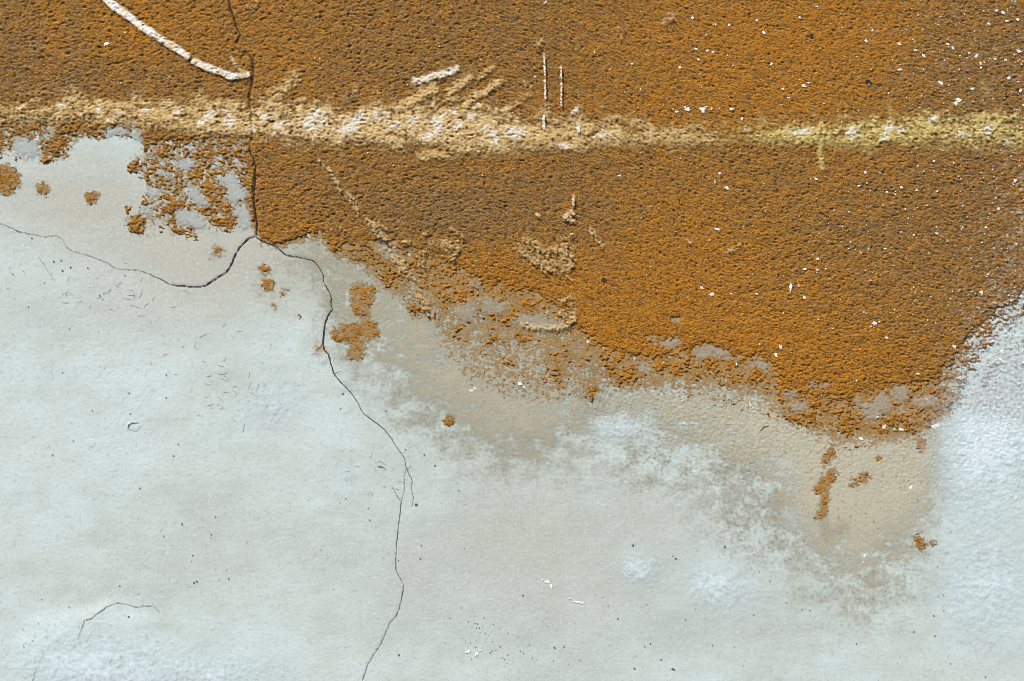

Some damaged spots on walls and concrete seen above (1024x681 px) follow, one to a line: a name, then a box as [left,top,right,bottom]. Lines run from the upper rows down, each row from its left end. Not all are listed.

crack [0,0,413,680]
corrosion [0,0,1024,519]
leakage [299,240,1024,622]